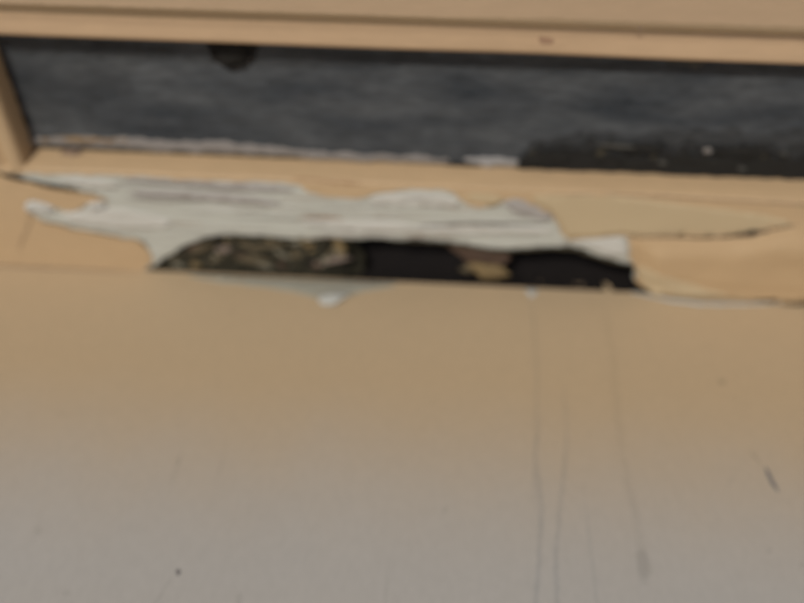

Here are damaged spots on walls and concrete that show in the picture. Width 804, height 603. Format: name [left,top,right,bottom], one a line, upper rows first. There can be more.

peeling [9,173,791,303]